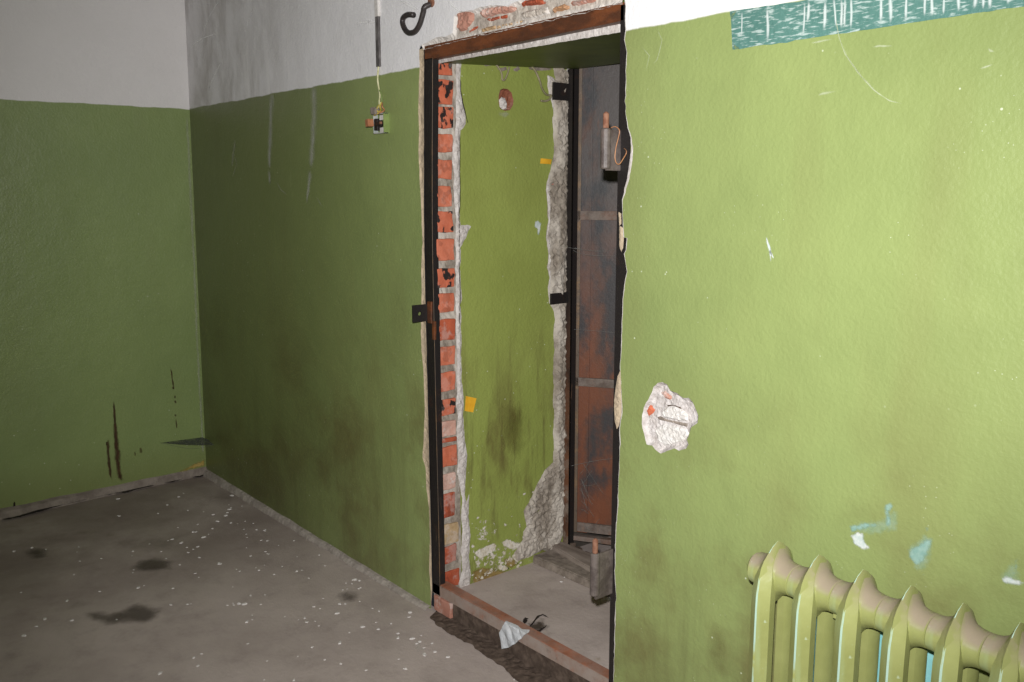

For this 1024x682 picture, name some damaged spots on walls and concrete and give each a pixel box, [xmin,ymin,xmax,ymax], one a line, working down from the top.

spalling [619,87,633,318]
spalling [418,0,627,600]
corrosion [106,404,122,479]
spalling [642,382,698,453]
peeling [852,524,869,549]
peeling [910,541,930,564]